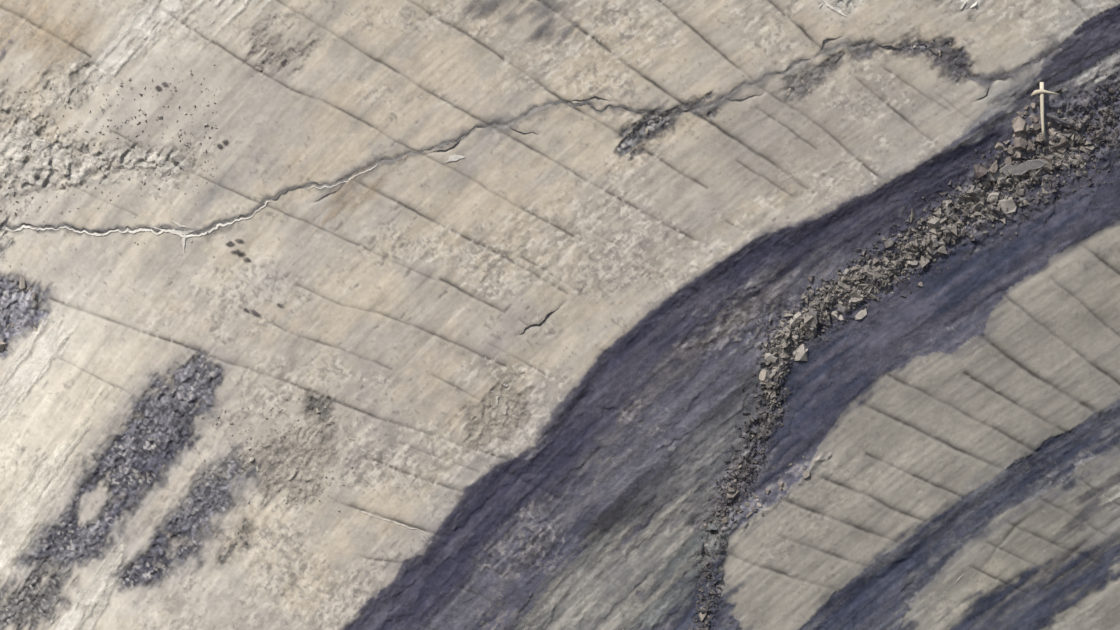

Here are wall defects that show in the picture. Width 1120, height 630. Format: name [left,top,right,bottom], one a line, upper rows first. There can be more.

spalling [0,219,14,257]
spalling [0,0,317,204]
spalling [226,239,250,261]
crack [0,36,1059,238]
spalling [784,31,980,101]
spalling [884,103,1106,265]
spalling [0,274,51,359]
crack [519,306,560,335]
spalling [759,266,873,385]
spalling [0,351,223,630]
spalling [112,396,336,591]
spalling [703,458,786,530]